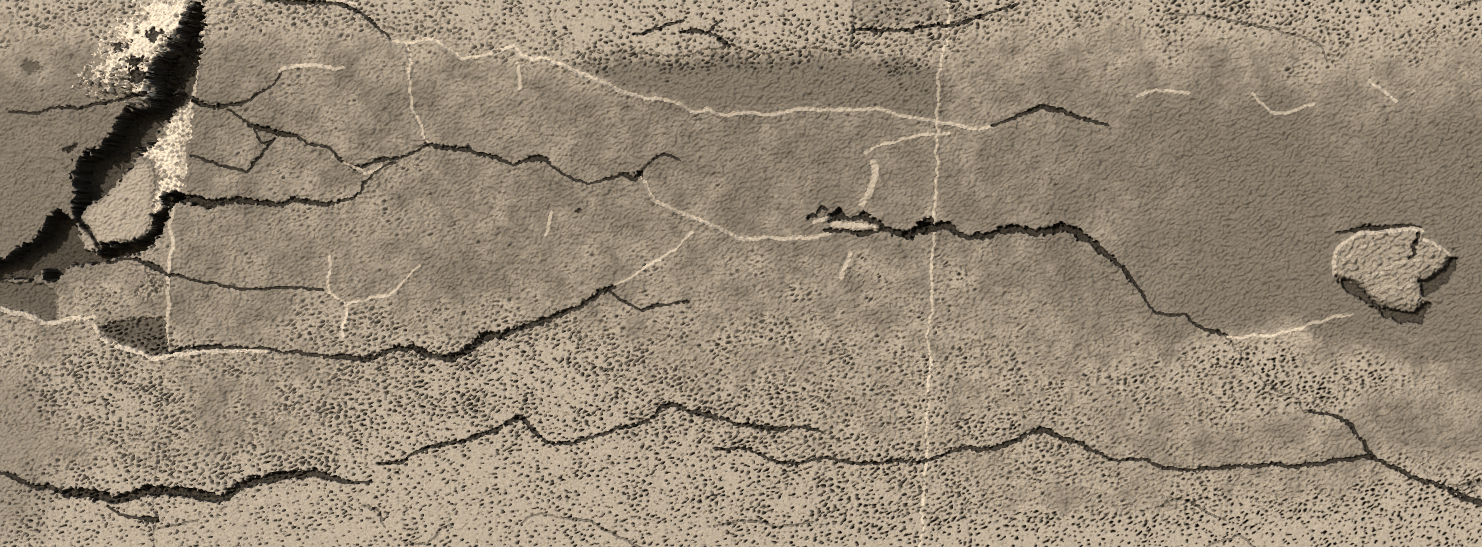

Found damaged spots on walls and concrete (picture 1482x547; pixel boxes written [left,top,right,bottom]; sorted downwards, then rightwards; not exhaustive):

crack [1169,12,1328,63]
crack [8,91,149,115]
crack [159,0,1110,241]
crack [105,254,421,337]
crack [164,230,694,363]
crack [712,217,1482,506]
crack [0,401,824,529]